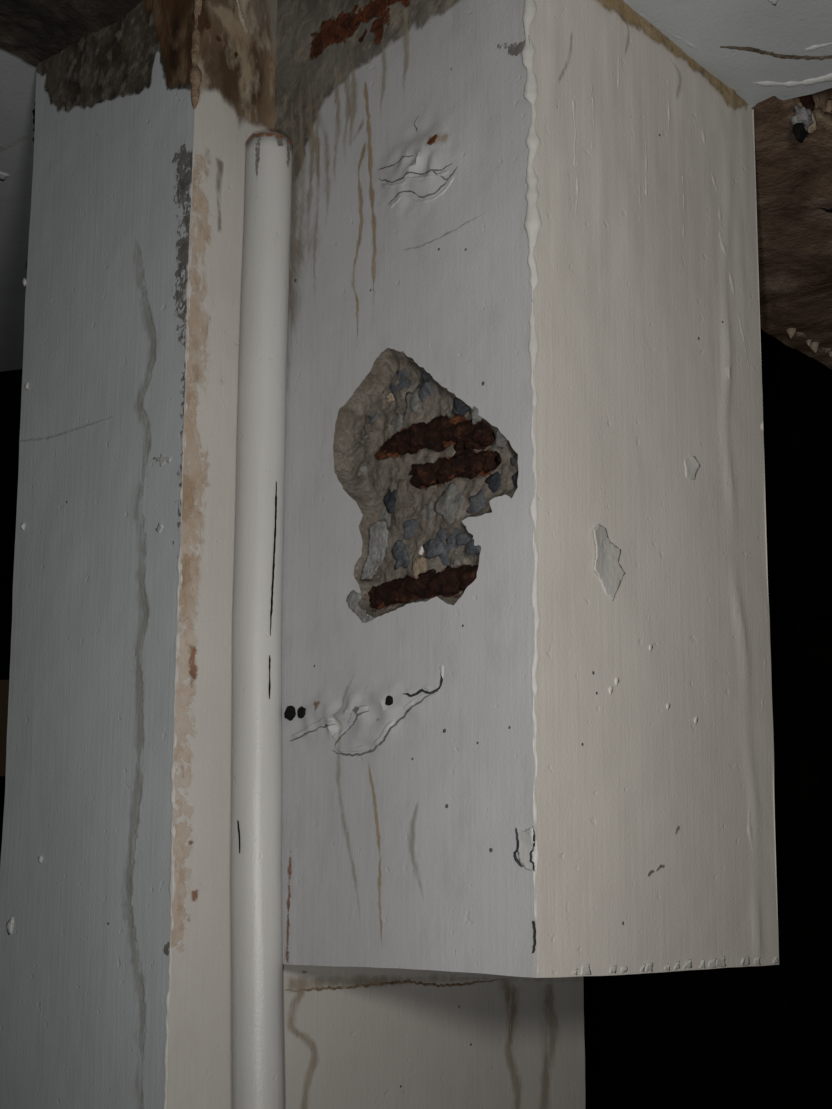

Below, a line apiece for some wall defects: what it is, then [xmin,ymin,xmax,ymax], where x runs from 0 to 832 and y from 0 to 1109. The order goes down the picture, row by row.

corrosion [310,0,410,60]
damp [600,0,748,109]
crack [720,46,832,60]
damp [36,0,458,308]
spalling [333,348,518,623]
peeling [163,145,220,955]
peeling [593,524,625,601]
damp [369,768,380,850]
damp [290,990,316,1109]